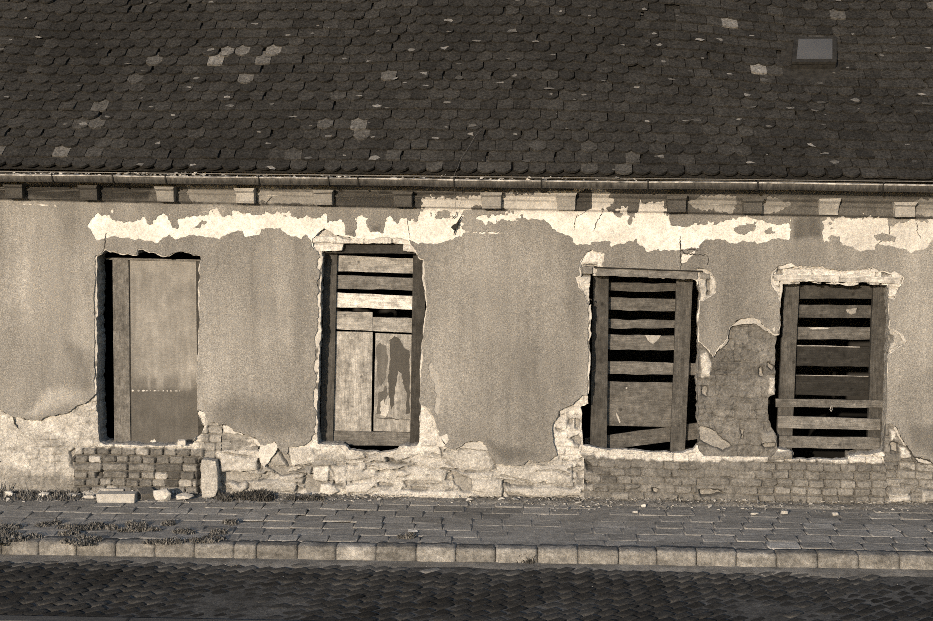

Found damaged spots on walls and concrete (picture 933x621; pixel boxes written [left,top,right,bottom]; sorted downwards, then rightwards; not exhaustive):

peeling [87,184,791,304]
flaking render [772,263,902,299]
peeling [822,197,933,253]
flaking render [0,318,933,504]